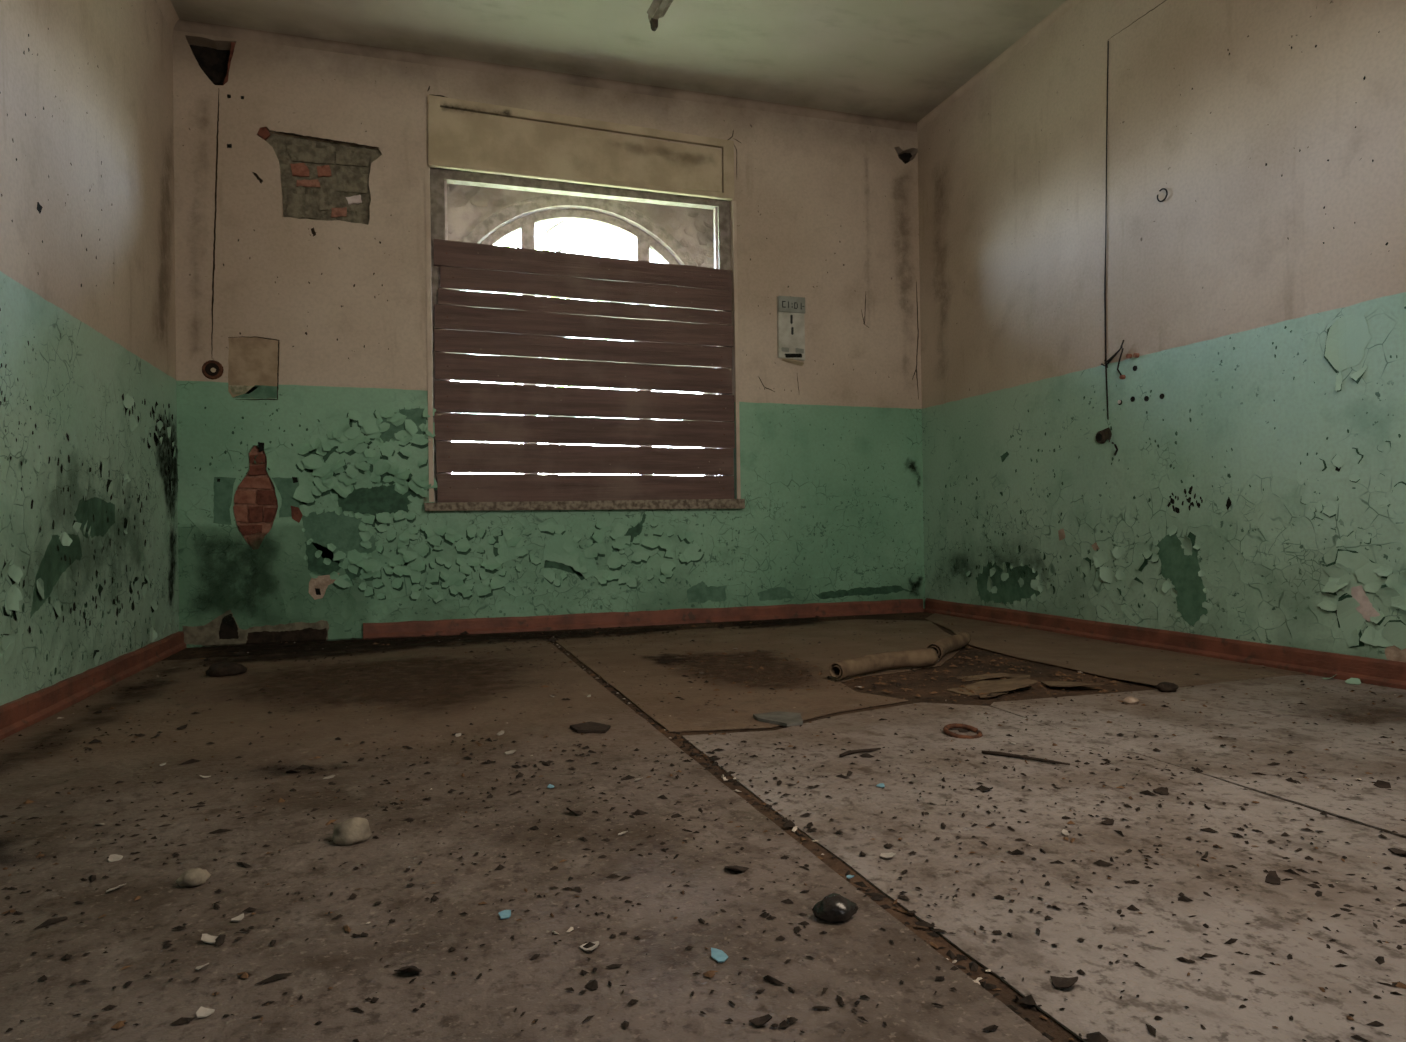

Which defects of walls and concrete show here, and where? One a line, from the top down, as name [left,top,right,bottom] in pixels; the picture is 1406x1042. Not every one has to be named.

spalling [257,127,381,236]
peeling [1314,315,1372,394]
peeling [122,393,176,491]
peeling [0,400,163,664]
peeling [194,403,727,616]
water stain [200,538,274,612]
spalling [182,610,329,646]
peeling [814,582,911,599]
water stain [647,651,810,687]